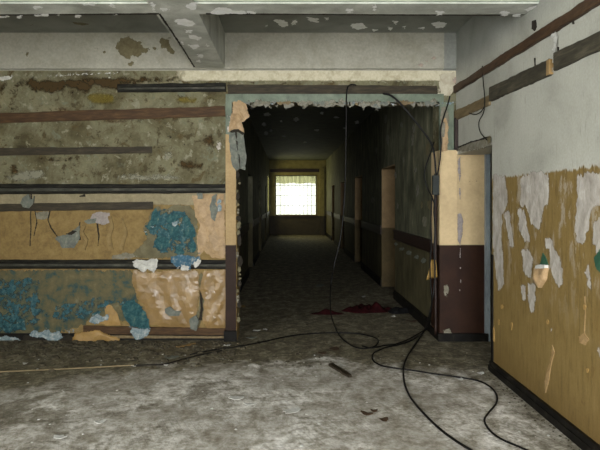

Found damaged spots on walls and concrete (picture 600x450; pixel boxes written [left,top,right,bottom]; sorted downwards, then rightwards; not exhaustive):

peeling [210,7,256,15]
peeling [419,11,447,29]
damp [15,77,175,104]
peeling [0,204,204,341]
peeling [210,194,222,221]
peeling [216,72,456,322]
peeling [492,170,563,313]
peeling [575,171,600,290]